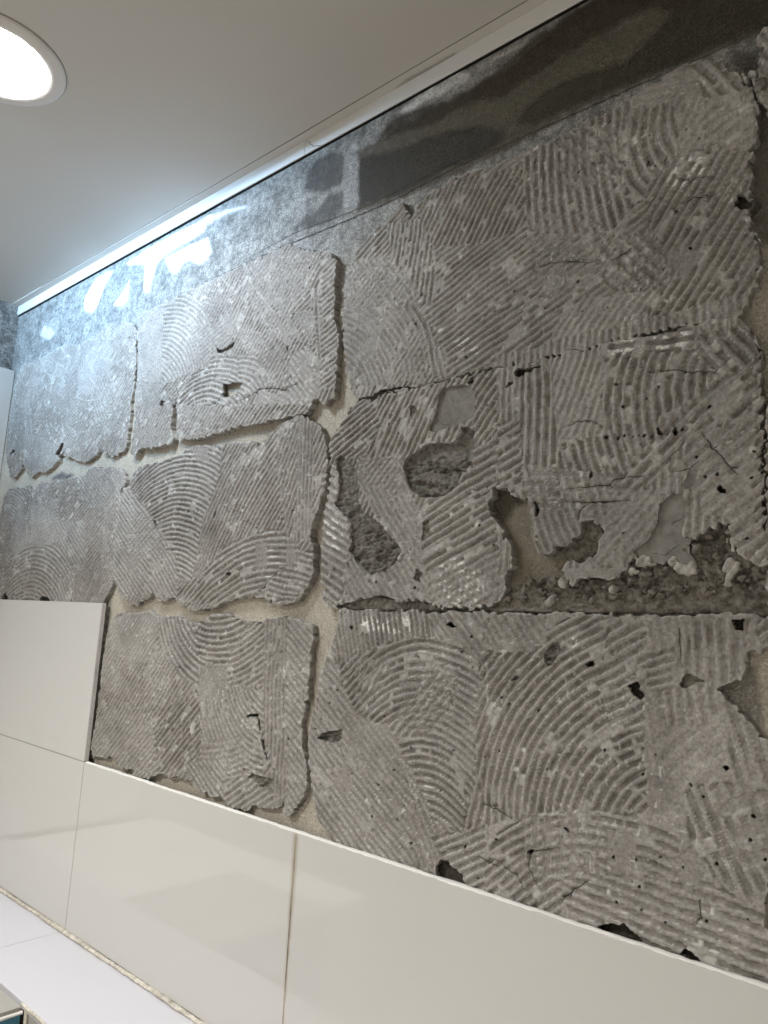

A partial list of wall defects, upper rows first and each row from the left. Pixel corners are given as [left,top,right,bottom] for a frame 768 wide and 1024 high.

spalling [11,89,768,817]